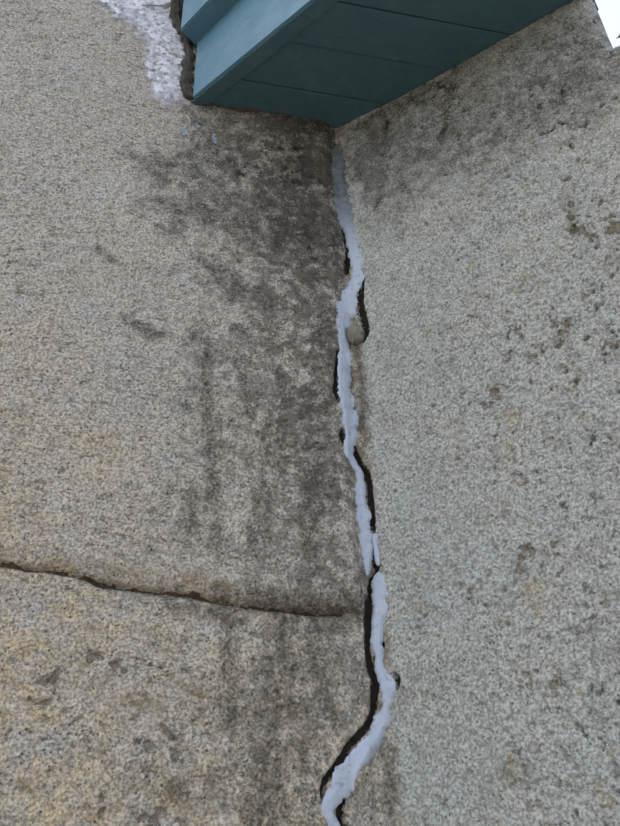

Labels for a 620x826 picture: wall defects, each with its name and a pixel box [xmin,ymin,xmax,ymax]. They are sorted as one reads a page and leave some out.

damp [118,102,339,369]
damp [192,334,219,504]
damp [298,389,341,540]
crack [320,147,401,826]
crack [0,562,342,617]